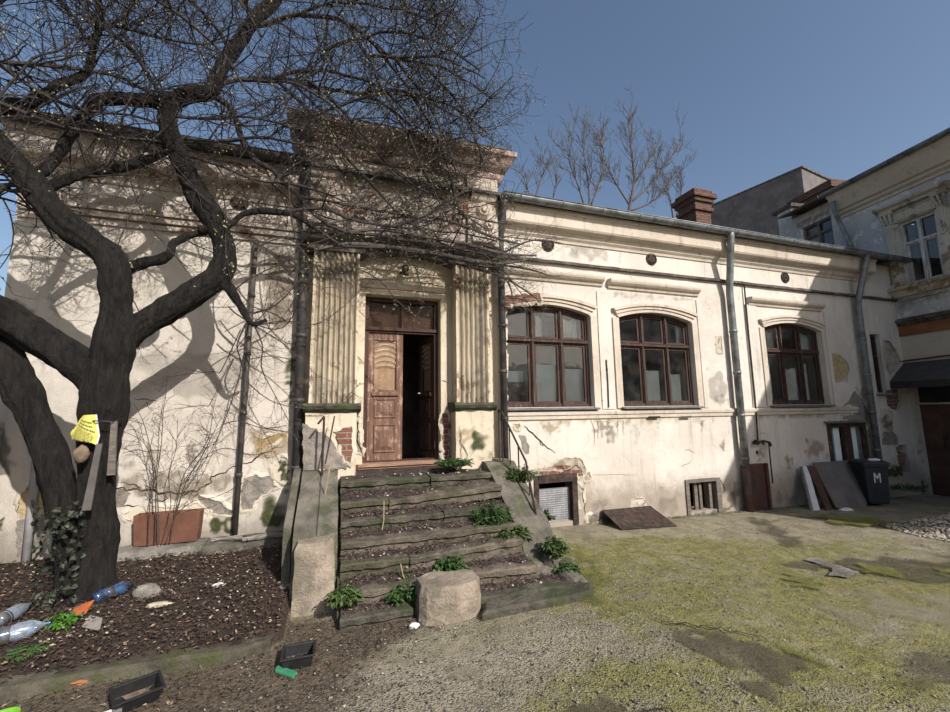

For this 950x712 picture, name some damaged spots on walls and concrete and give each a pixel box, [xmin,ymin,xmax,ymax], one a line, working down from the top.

peeling [831,352,906,467]
spalling [148,414,366,523]
spalling [534,454,603,524]